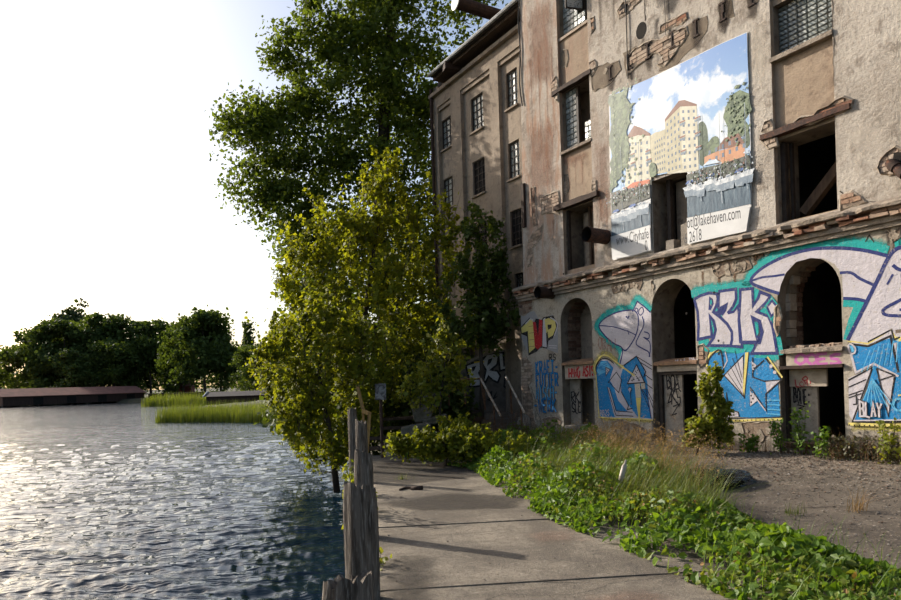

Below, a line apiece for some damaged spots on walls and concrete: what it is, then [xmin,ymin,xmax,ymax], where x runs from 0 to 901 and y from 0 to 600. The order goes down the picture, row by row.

spalling [617,0,642,20]
spalling [589,12,689,92]
spalling [526,174,569,267]
peeling [886,225,901,243]
peeling [711,256,753,278]